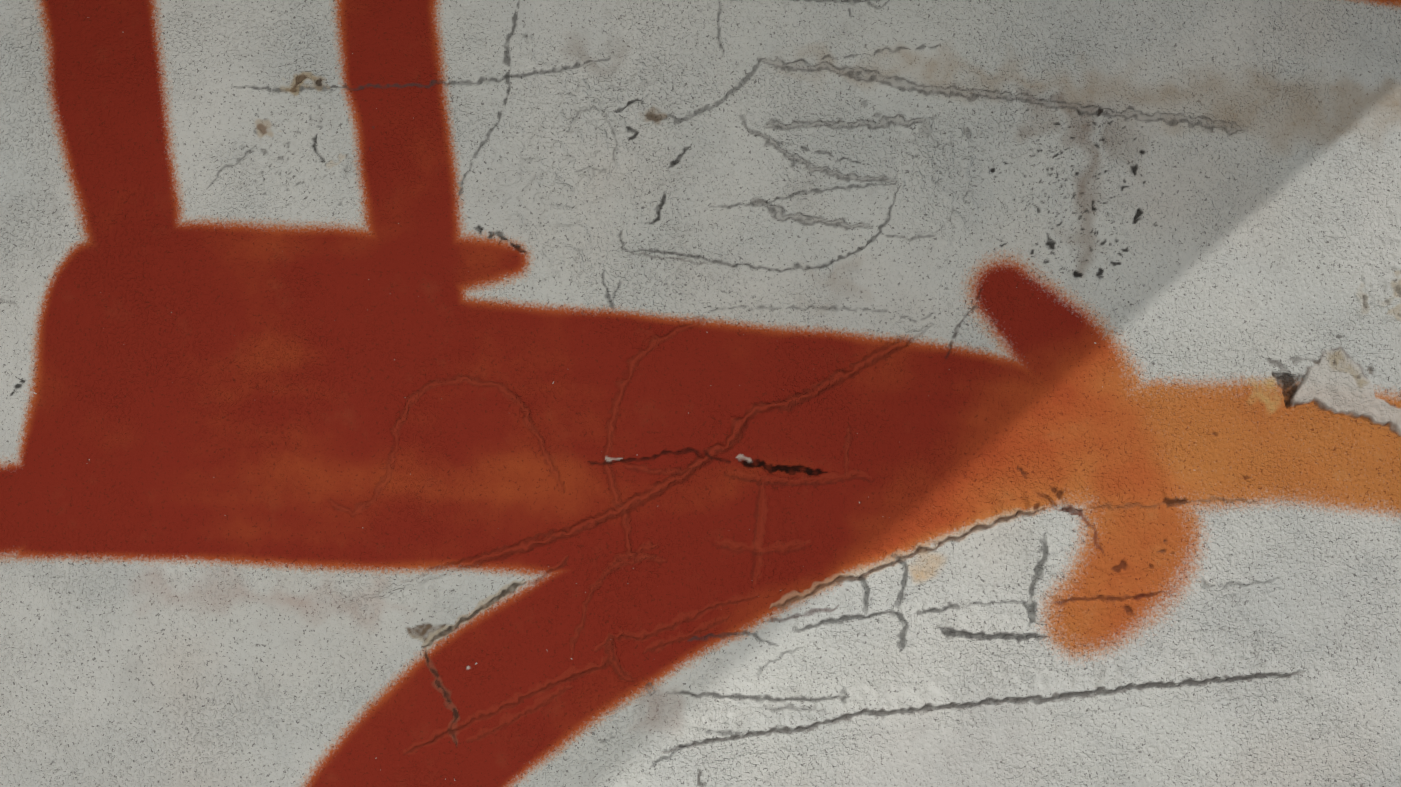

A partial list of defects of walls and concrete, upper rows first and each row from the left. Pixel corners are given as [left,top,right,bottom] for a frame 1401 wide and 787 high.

crack [199,140,263,195]
crack [218,0,535,261]
crack [594,0,1253,373]
spalling [1352,273,1401,322]
spalling [1251,340,1401,441]
crack [575,420,886,498]
crack [587,478,1323,787]